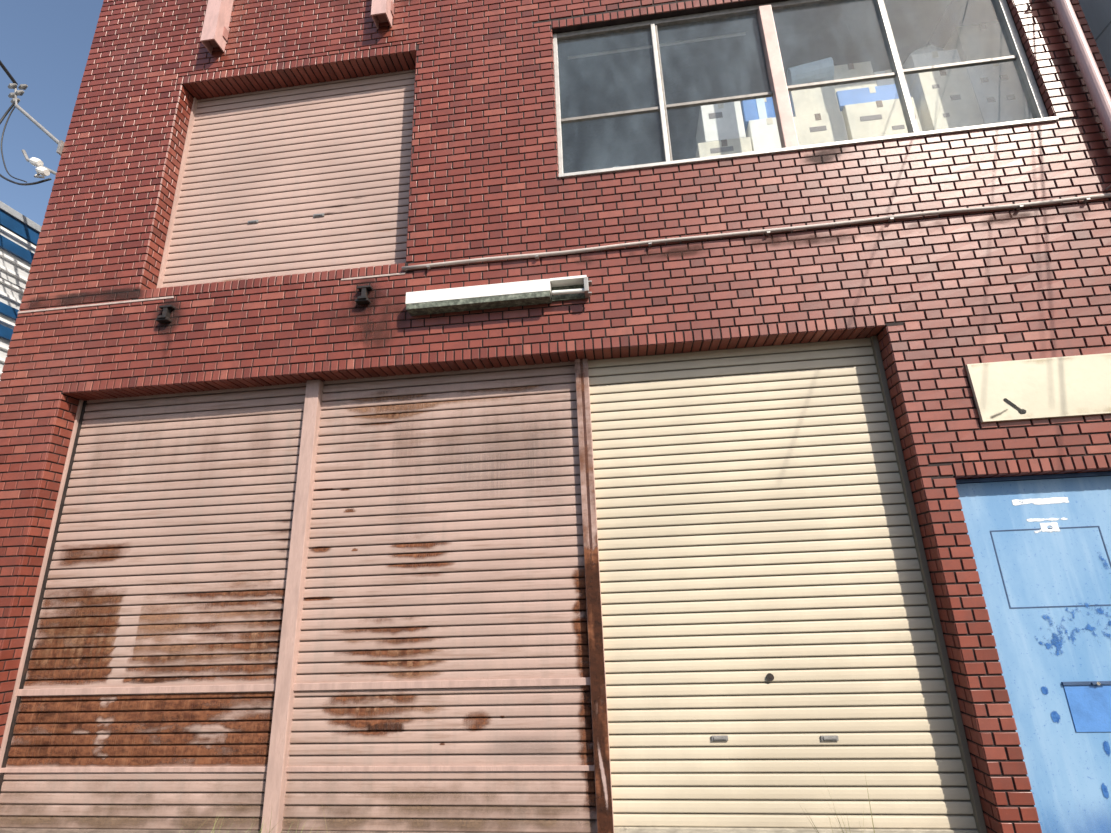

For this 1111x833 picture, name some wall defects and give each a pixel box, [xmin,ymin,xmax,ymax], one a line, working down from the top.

rust [349,385,544,425]
rust [62,545,130,565]
rust [389,542,452,575]
peeling [1037,603,1111,656]
rust [344,626,440,678]
rust [6,580,285,766]
rust [572,524,614,833]
rust [324,694,435,735]
rust [465,714,504,731]